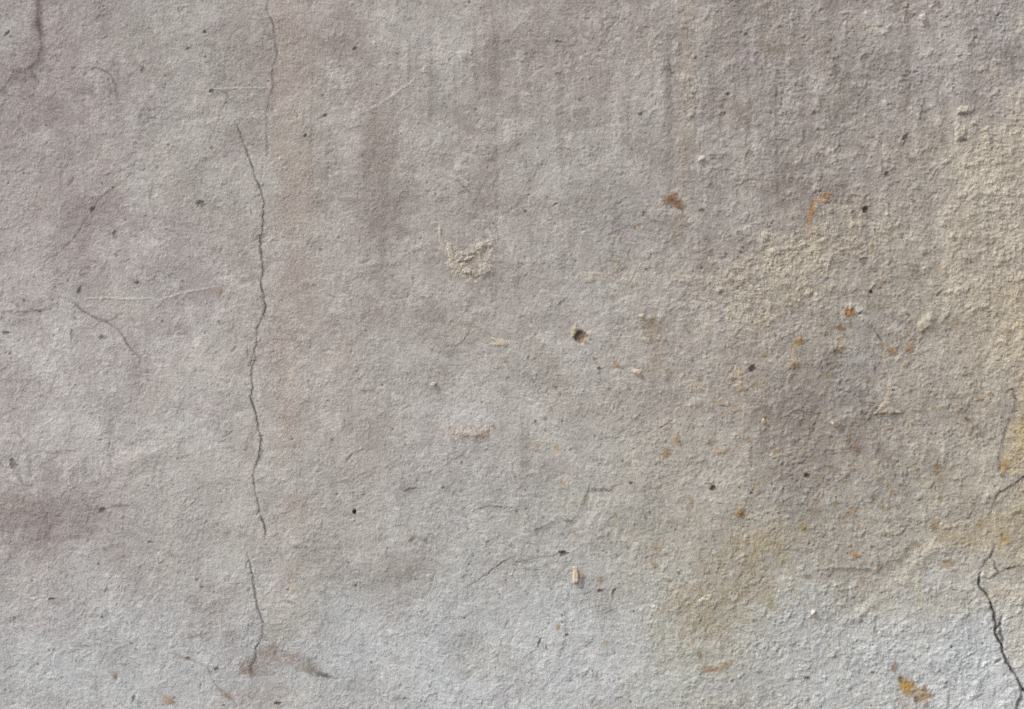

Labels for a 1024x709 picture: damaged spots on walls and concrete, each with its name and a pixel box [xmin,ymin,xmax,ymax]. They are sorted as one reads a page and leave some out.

crack [239,131,266,316]
rust [663,192,683,209]
crack [250,355,266,534]
rust [892,661,930,703]
crack [978,548,1024,709]